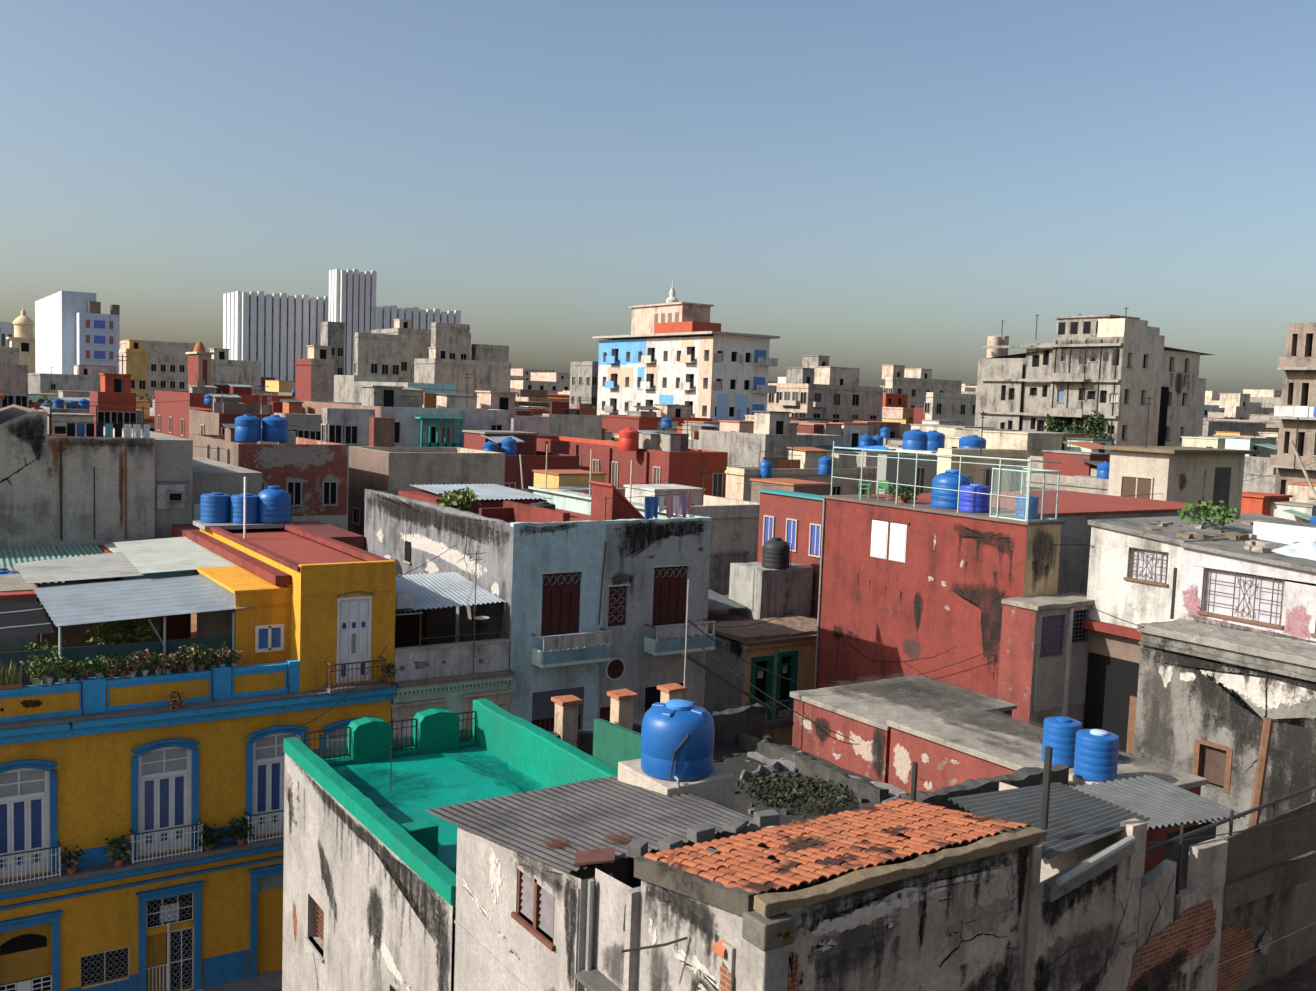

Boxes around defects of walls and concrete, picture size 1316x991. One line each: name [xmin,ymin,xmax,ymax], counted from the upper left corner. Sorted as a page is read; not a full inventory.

leakage [10,416,45,460]
crack [0,457,40,486]
leakage [616,520,703,556]
peeling [1183,586,1207,621]
peeling [1267,606,1311,638]
peeling [833,730,960,784]
leakage [1142,648,1316,822]
leakage [287,763,449,991]
leakage [645,882,718,958]
peeling [673,939,732,991]
crack [939,921,1008,968]
spalling [1123,900,1272,991]